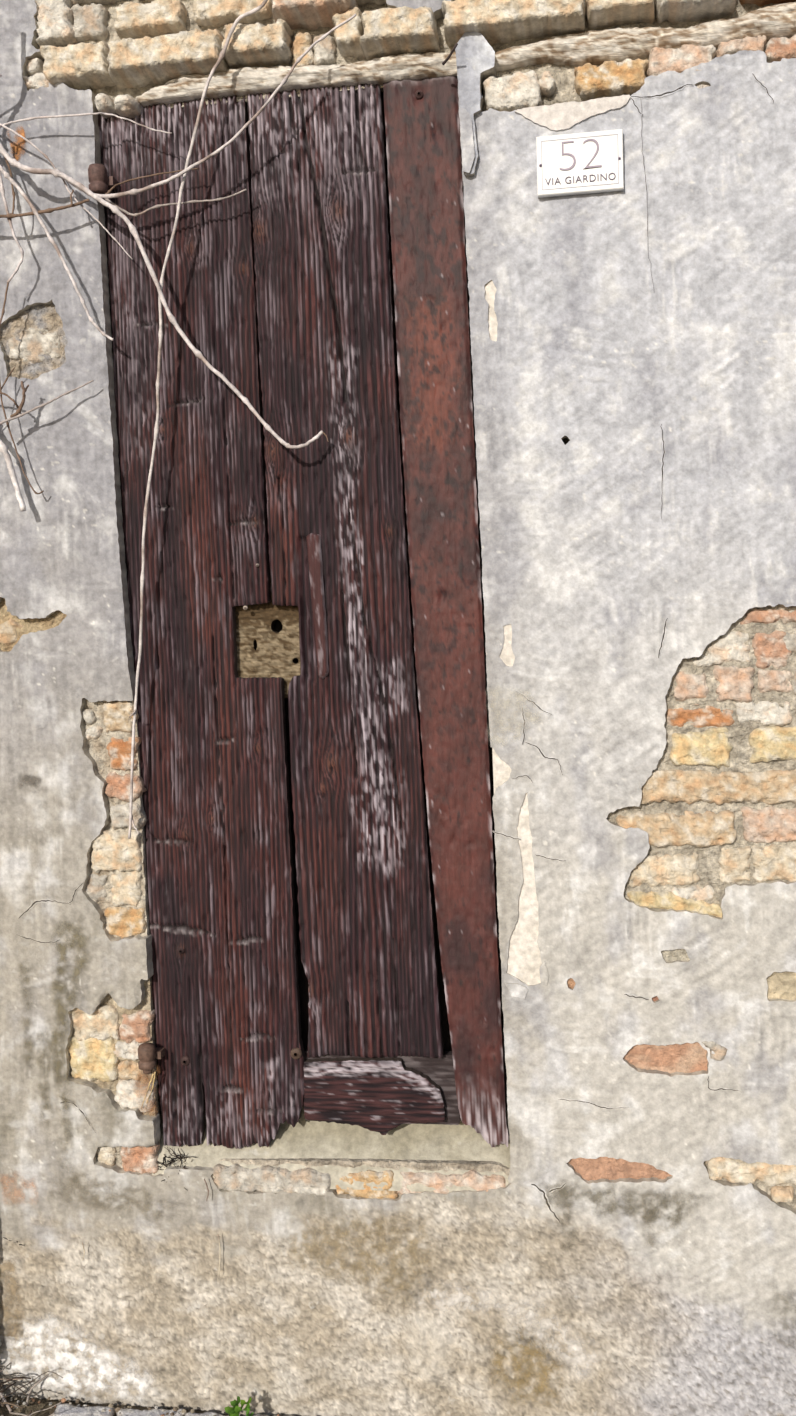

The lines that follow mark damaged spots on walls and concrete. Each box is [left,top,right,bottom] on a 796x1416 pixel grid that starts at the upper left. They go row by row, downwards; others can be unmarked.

spalling [0,303,68,380]
spalling [0,598,67,652]
peeling [492,748,512,793]
spalling [607,604,796,918]
spalling [83,699,151,938]
peeling [505,792,549,999]
spalling [766,971,796,1000]
spalling [68,977,159,1116]
spalling [623,1041,728,1073]
spalling [97,1140,161,1174]
spalling [568,1157,672,1181]
spalling [704,1157,796,1210]